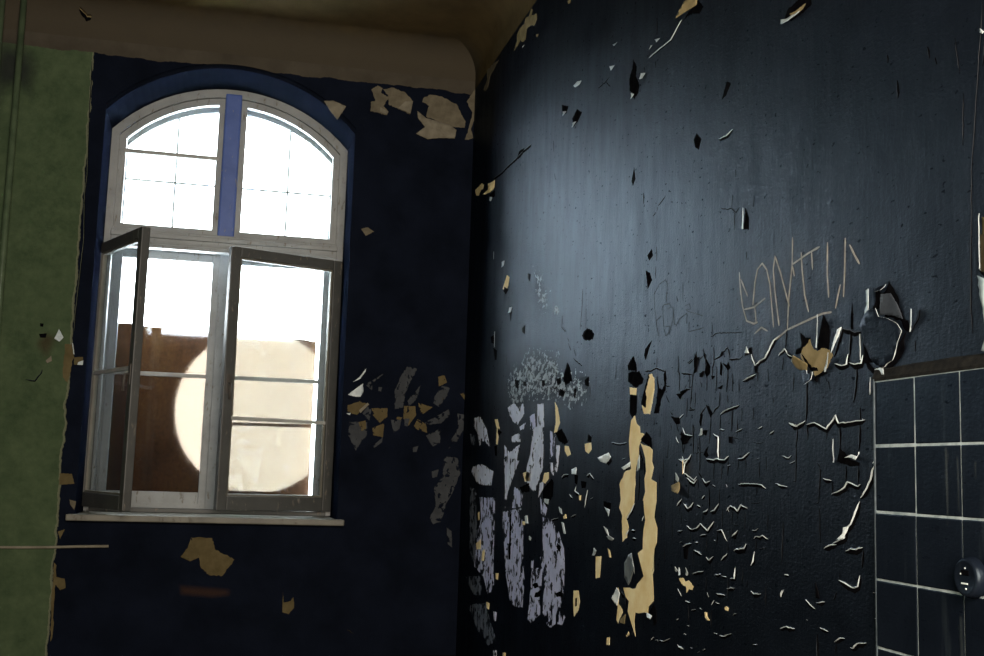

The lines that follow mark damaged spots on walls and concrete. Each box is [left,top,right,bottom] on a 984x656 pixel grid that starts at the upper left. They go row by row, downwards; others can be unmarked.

peeling [514,9,538,50]
peeling [675,0,703,21]
peeling [780,0,812,24]
peeling [629,60,656,98]
peeling [370,60,499,140]
peeling [646,248,657,287]
peeling [580,310,594,341]
crack [831,307,861,360]
peeling [786,282,920,403]
peeling [832,443,860,466]
peeling [346,326,759,656]
peeling [181,537,234,576]